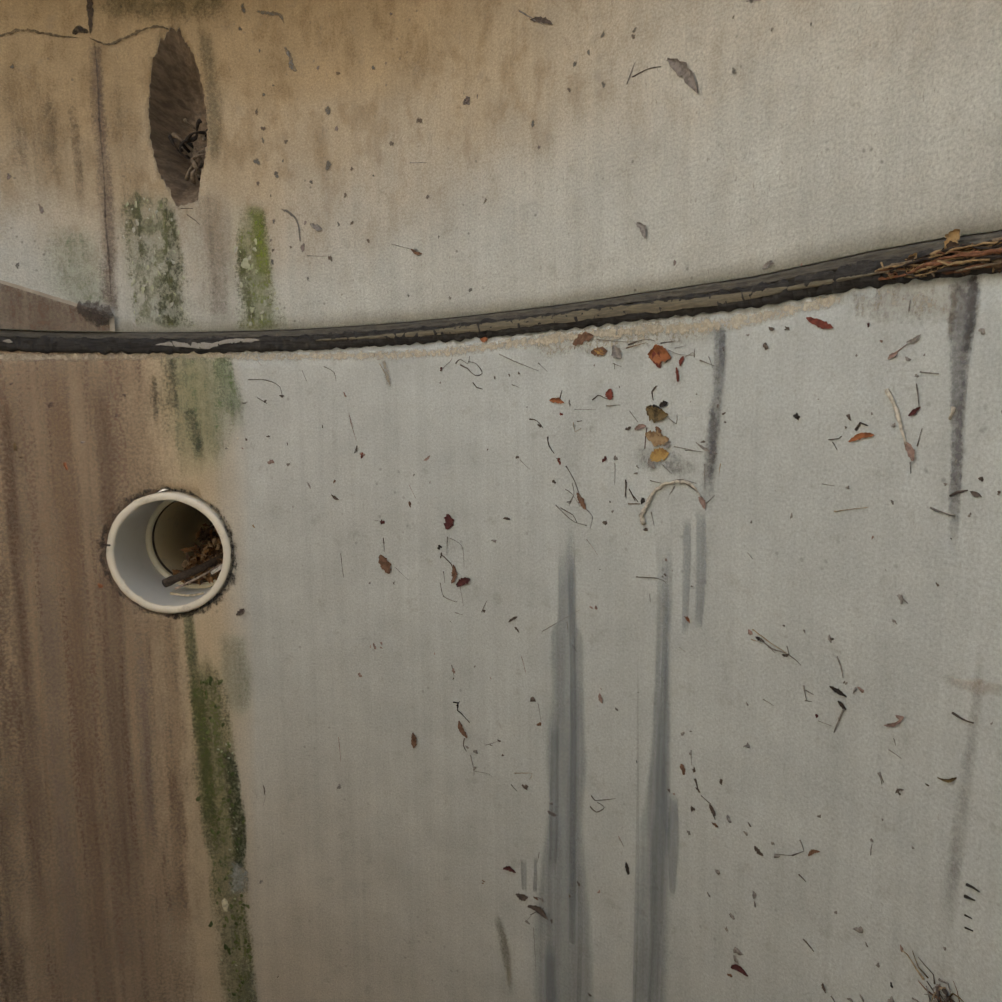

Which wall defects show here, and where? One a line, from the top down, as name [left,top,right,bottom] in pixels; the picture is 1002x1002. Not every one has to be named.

crack [0,0,168,155]
crack [258,11,284,23]
crack [285,48,296,71]
crack [103,187,111,292]
crack [282,209,301,241]
leakage [949,276,978,502]
leakage [0,296,835,1002]